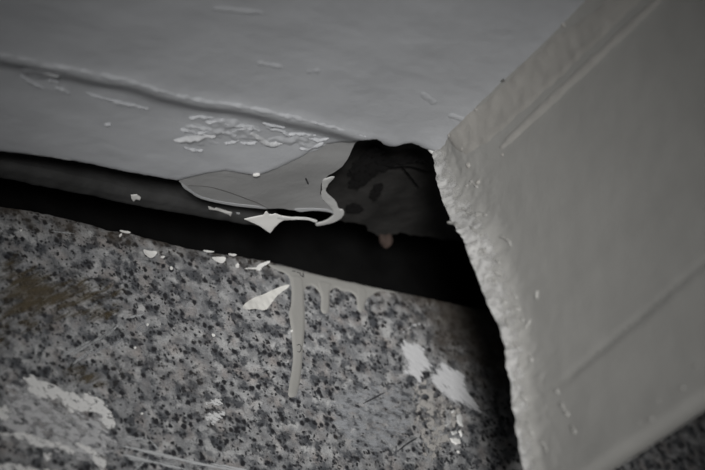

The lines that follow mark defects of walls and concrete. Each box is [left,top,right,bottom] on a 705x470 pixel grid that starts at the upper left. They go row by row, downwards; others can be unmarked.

peeling [173,115,357,233]